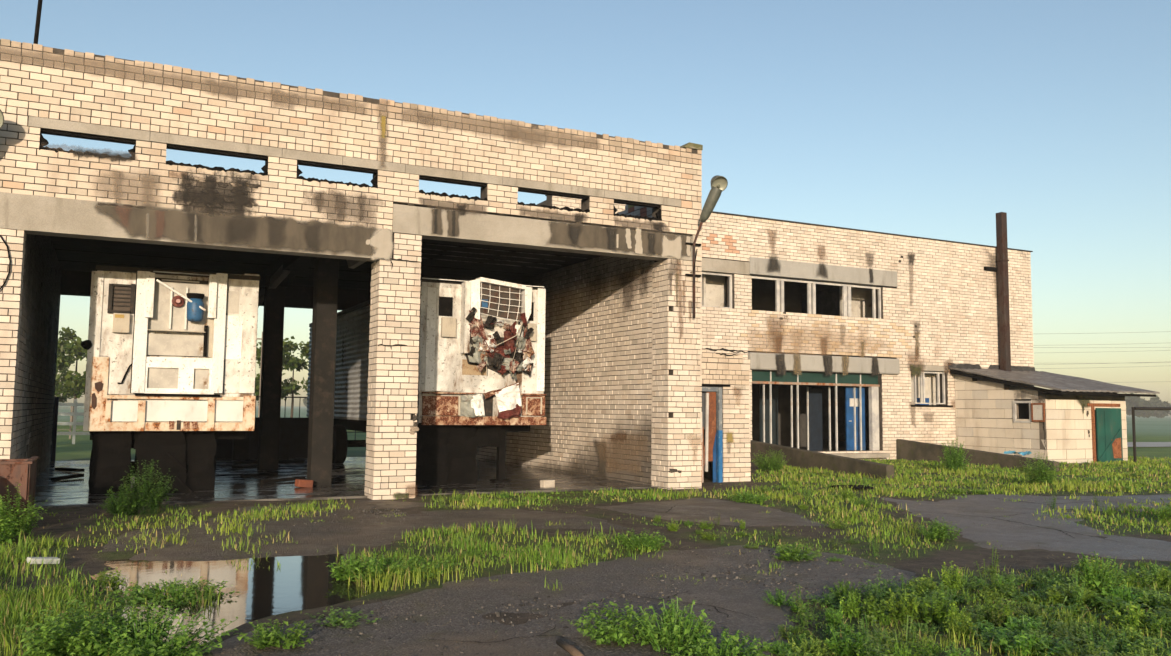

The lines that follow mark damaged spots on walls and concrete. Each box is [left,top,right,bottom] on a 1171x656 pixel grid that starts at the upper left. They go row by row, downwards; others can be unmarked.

leakage [95,173,376,256]
leakage [432,204,466,236]
leakage [549,214,691,256]
leakage [775,354,801,375]
leakage [823,355,849,376]
leakage [871,356,880,376]